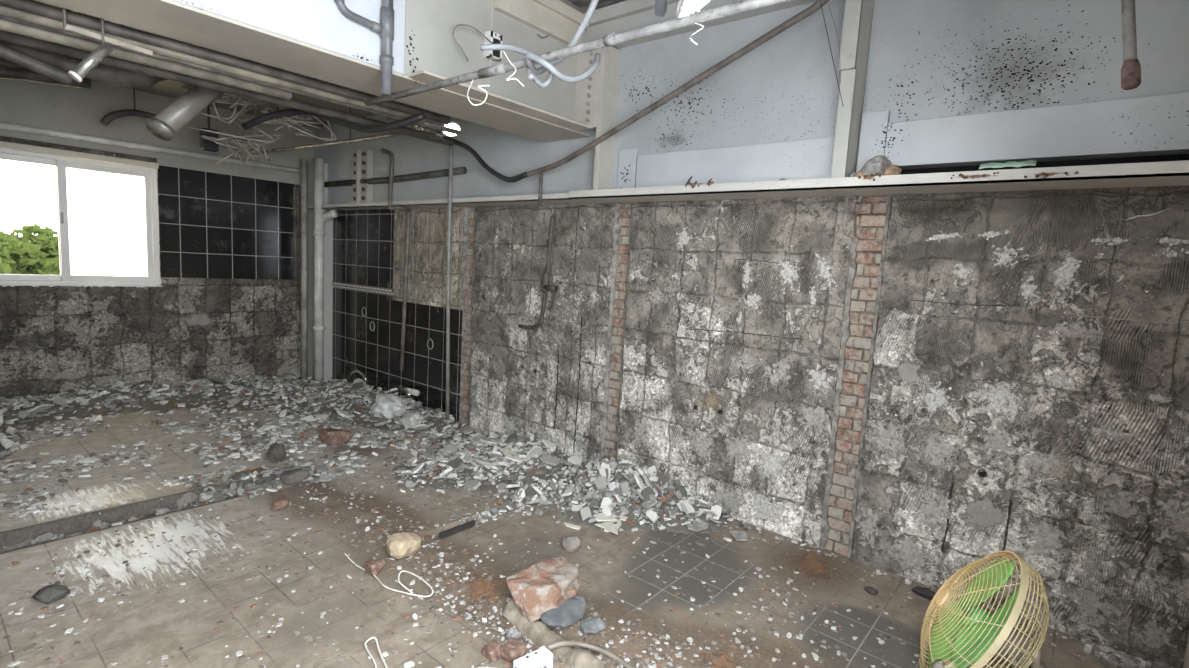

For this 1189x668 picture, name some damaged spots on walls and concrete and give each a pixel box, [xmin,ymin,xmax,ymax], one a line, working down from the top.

water stain [872,5,1123,158]
peeling [675,226,691,252]
peeling [925,230,1189,305]
spalling [459,208,520,433]
spalling [590,203,652,460]
spalling [730,195,963,558]
peeling [688,426,789,526]
crack [941,482,954,553]
crack [1002,499,1012,551]
peeling [969,372,1078,488]
peeling [1021,511,1076,567]
peeling [1050,571,1183,649]